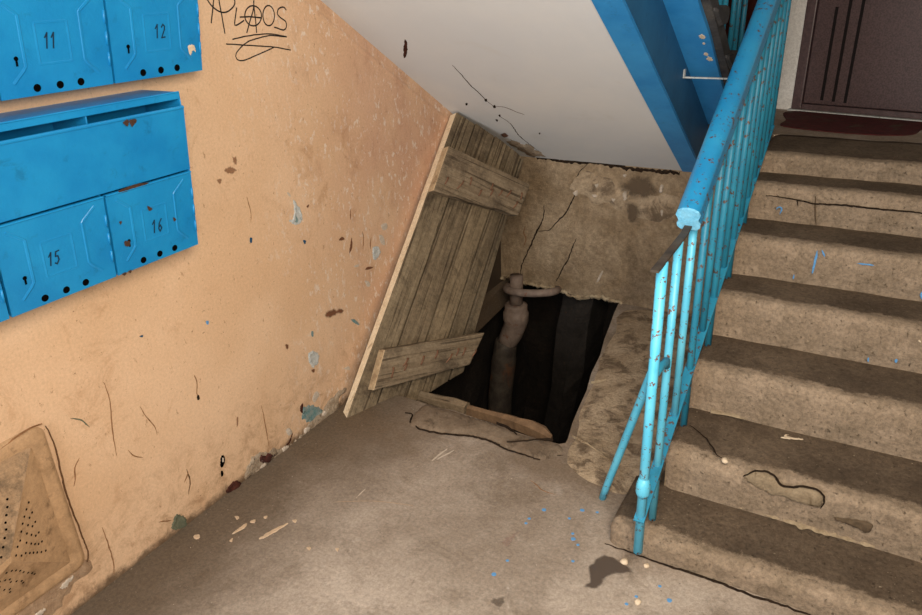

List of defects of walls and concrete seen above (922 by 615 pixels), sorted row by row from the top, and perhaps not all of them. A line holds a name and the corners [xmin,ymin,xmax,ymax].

crack [452,65,680,274]
spalling [570,171,681,222]
crack [766,195,922,223]
spalling [226,388,347,493]
crack [405,412,562,495]
leakage [586,556,630,588]